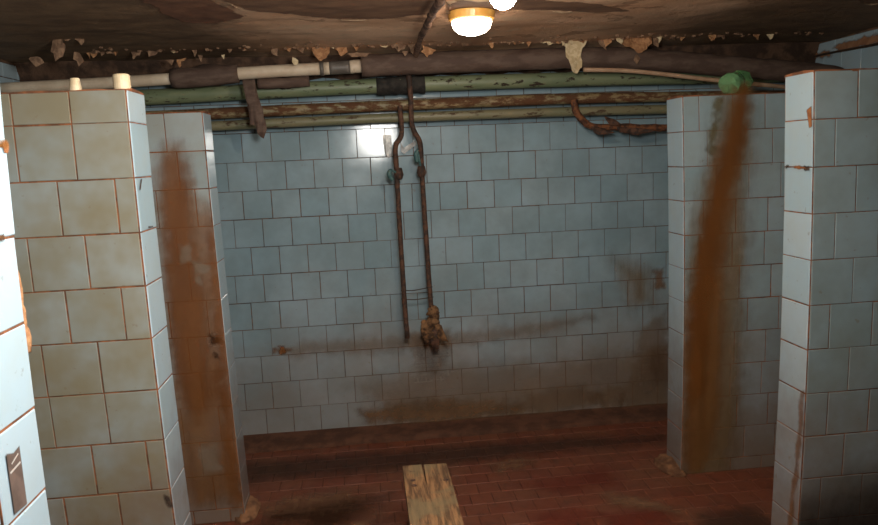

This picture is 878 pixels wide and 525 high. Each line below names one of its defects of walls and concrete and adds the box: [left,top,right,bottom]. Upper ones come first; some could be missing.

peeling [142,0,434,24]
peeling [446,0,628,14]
peeling [51,39,84,66]
peeling [312,47,372,61]
peeling [395,44,436,57]
peeling [564,40,587,73]
peeling [622,37,659,64]
peeling [816,35,878,58]
rust [686,98,747,474]
rust [161,152,241,502]